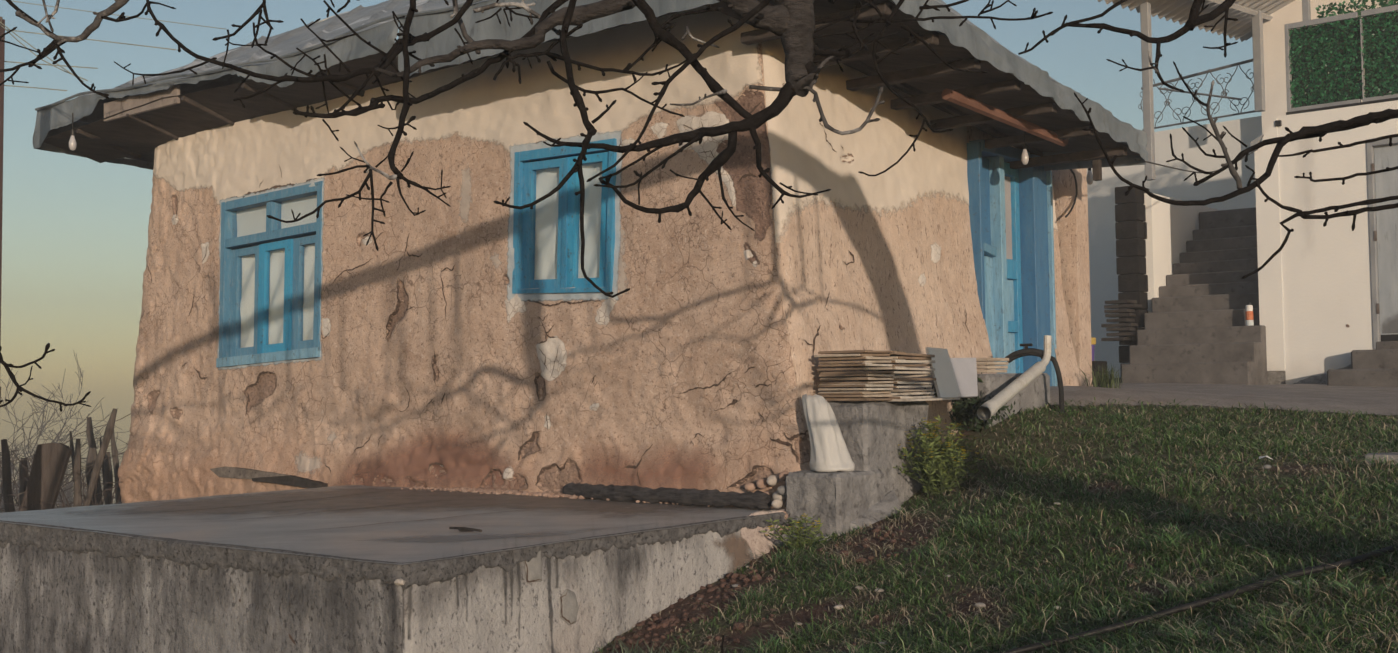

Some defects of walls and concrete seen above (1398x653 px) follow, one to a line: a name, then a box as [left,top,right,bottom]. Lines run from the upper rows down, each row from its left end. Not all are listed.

spalling [651,90,773,267]
spalling [385,280,414,341]
spalling [244,371,277,415]
peeling [479,254,582,493]
damp [121,438,703,514]
crack [623,444,653,485]
damp [547,557,558,652]